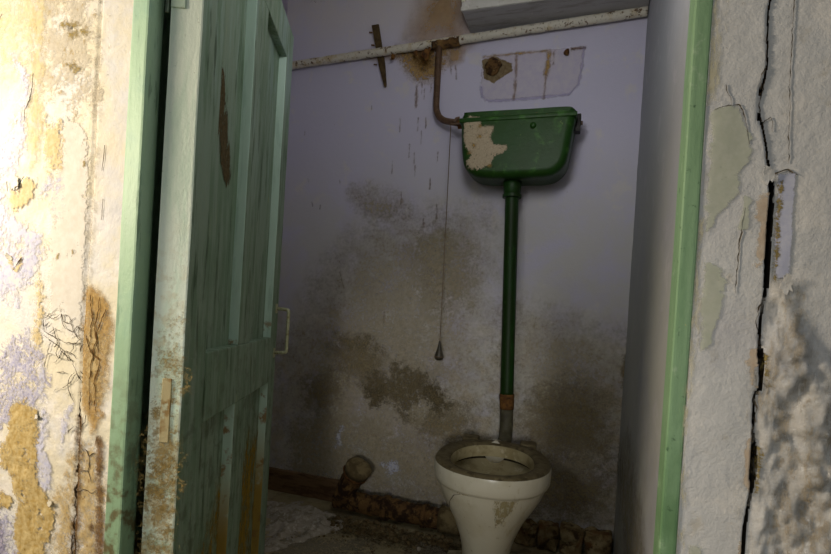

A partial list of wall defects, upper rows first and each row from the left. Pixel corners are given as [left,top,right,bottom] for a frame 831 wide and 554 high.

corrosion [384,46,460,106]
spalling [482,56,513,83]
crack [717,0,798,175]
peeling [0,53,89,338]
spalling [755,165,795,295]
spalling [0,327,55,554]
crack [43,314,96,554]
leakage [295,234,475,506]
leakage [515,338,614,524]
spalling [744,438,764,493]
crack [755,302,763,346]
crack [751,381,769,435]